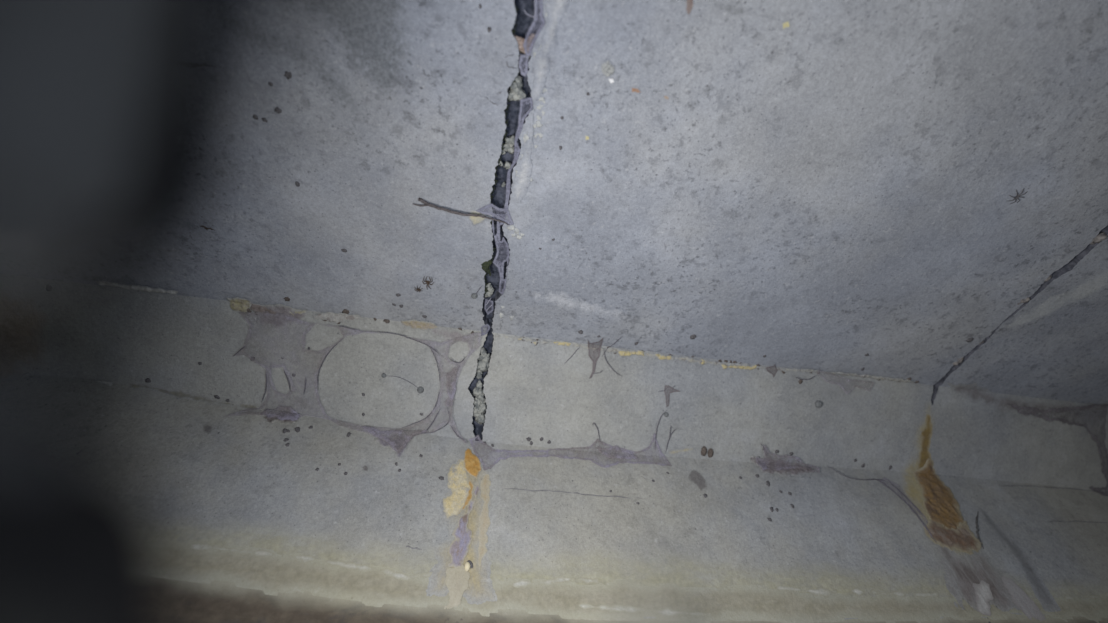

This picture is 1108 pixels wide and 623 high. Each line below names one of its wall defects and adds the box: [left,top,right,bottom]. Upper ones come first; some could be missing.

crack [469,0,544,441]
efflorescence [530,289,641,321]
rust [426,448,497,623]
rust [899,399,1046,621]